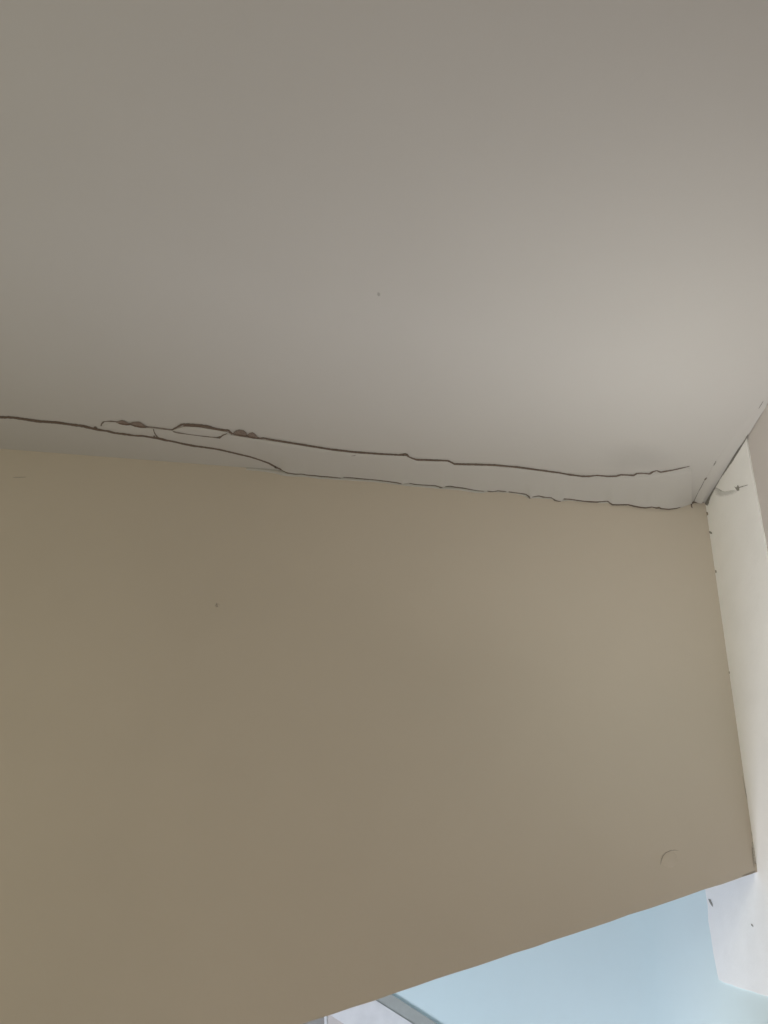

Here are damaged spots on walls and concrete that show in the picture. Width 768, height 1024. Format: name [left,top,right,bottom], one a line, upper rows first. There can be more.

crack [0,416,748,510]